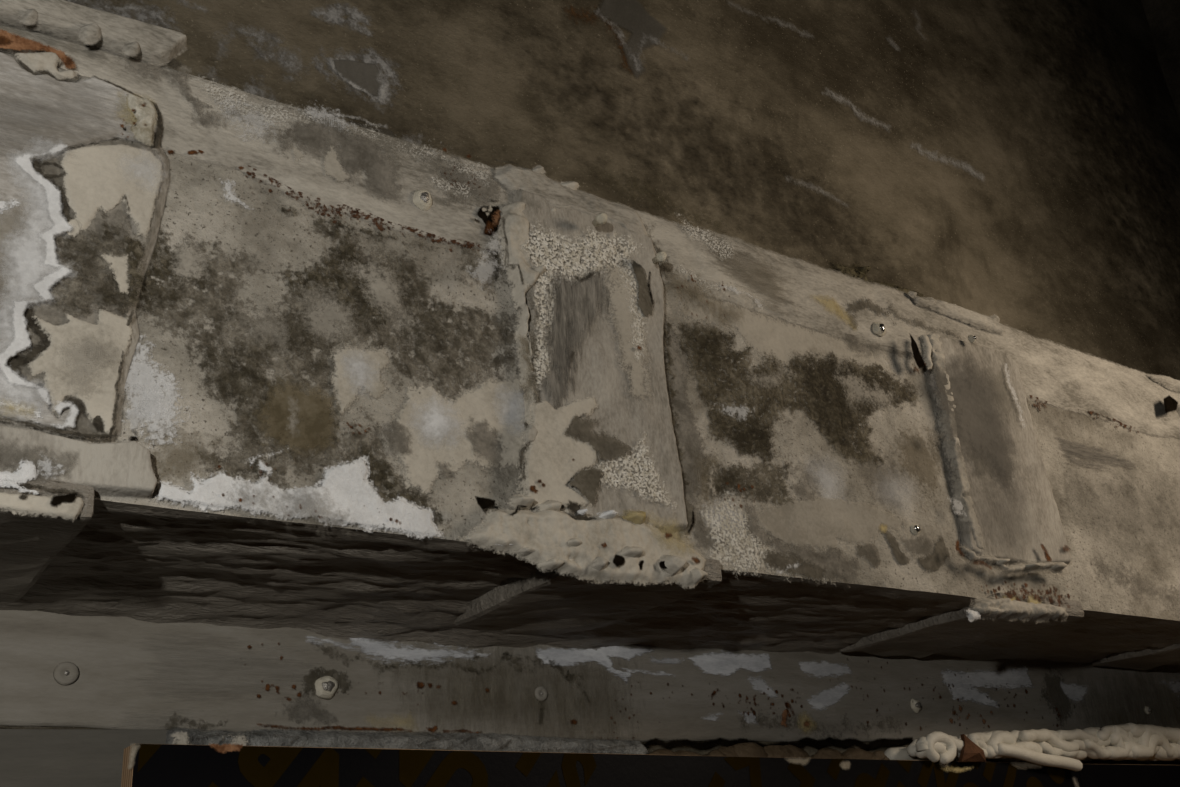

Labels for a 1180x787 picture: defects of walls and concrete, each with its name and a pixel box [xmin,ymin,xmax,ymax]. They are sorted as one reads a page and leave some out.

peeling [0,29,163,435]
damp [221,181,248,208]
rust [239,165,490,252]
damp [54,209,961,583]
damp [936,362,1015,486]
spalling [0,480,84,520]
damp [257,636,777,735]
damp [799,661,851,710]